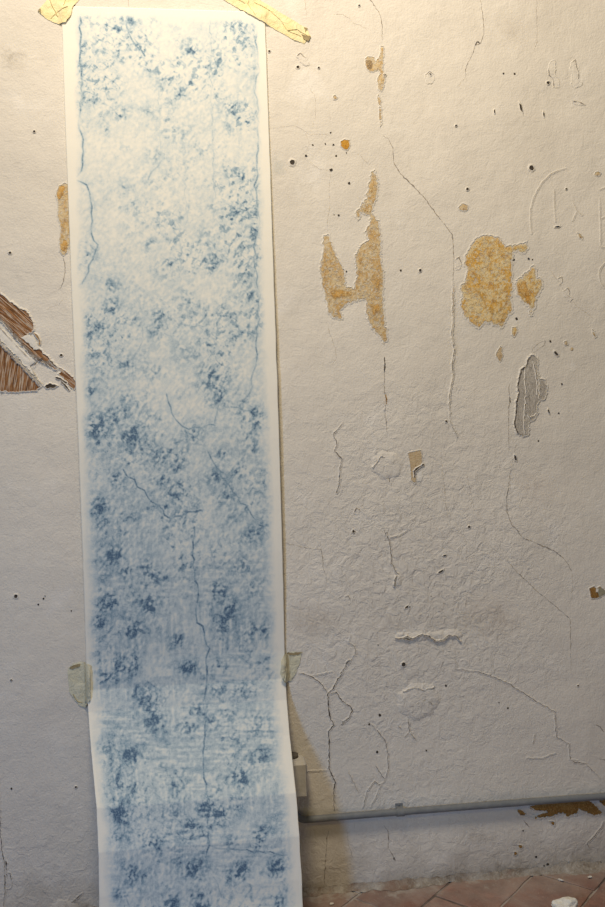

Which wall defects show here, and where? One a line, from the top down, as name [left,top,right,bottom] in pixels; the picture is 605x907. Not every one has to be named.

peeling [364,45,386,127]
peeling [55,182,70,257]
peeling [318,168,389,345]
crack [383,135,459,438]
peeling [458,233,544,338]
flaking render [0,289,76,394]
flaking render [512,353,559,442]
peeling [588,585,605,600]
crack [298,635,417,811]
crack [457,668,604,780]
crack [0,777,9,907]
peeling [515,800,605,827]